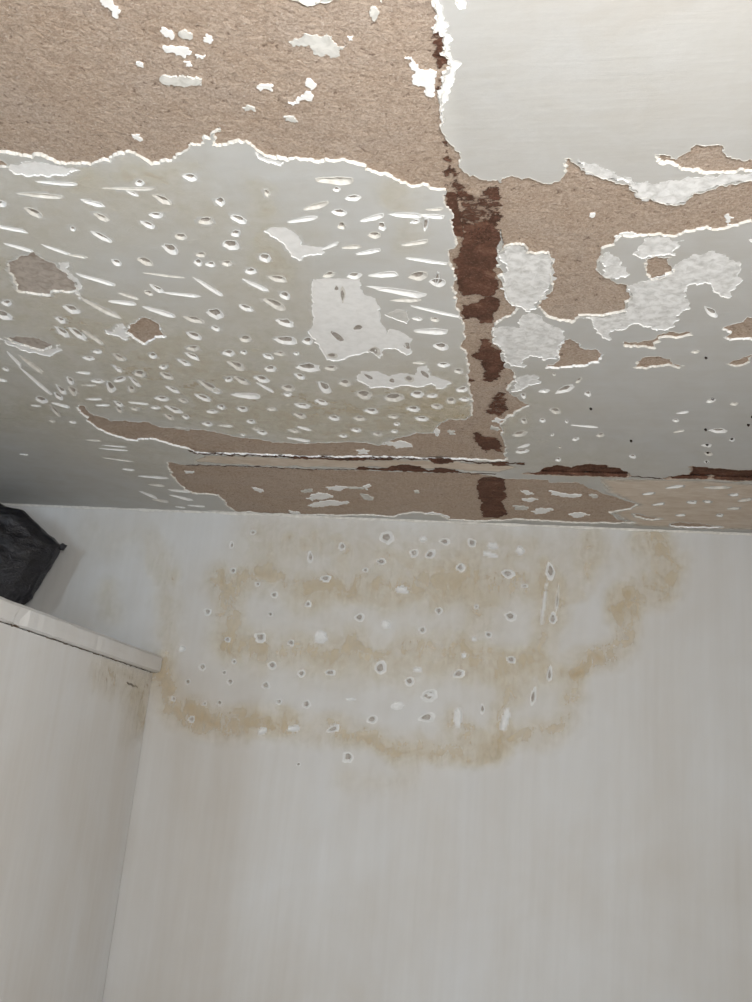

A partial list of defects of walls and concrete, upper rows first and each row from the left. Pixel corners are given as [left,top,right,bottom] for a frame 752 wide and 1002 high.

corrosion [432,32,447,96]
spalling [0,0,752,529]
corrosion [442,141,503,324]
corrosion [469,339,505,382]
corrosion [485,392,509,417]
corrosion [663,466,752,482]